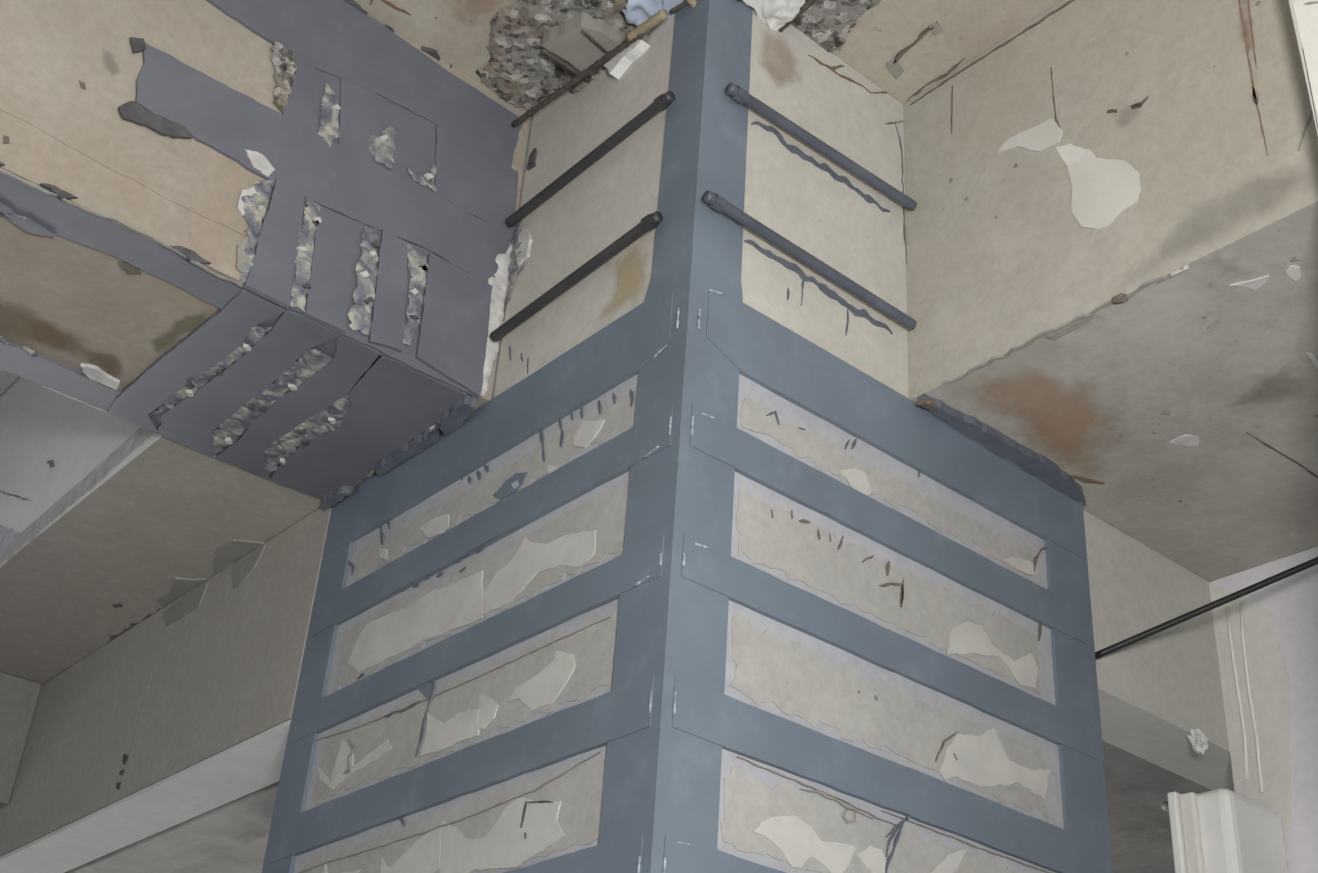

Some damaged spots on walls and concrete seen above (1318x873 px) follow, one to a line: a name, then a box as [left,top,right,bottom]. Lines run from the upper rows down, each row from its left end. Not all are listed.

spalling [270,41,297,113]
peeling [421,46,452,68]
spalling [476,0,697,127]
spalling [762,0,882,56]
rust [1238,0,1268,156]
peeling [1055,143,1141,230]
peeling [359,240,381,278]
water stain [0,311,120,375]